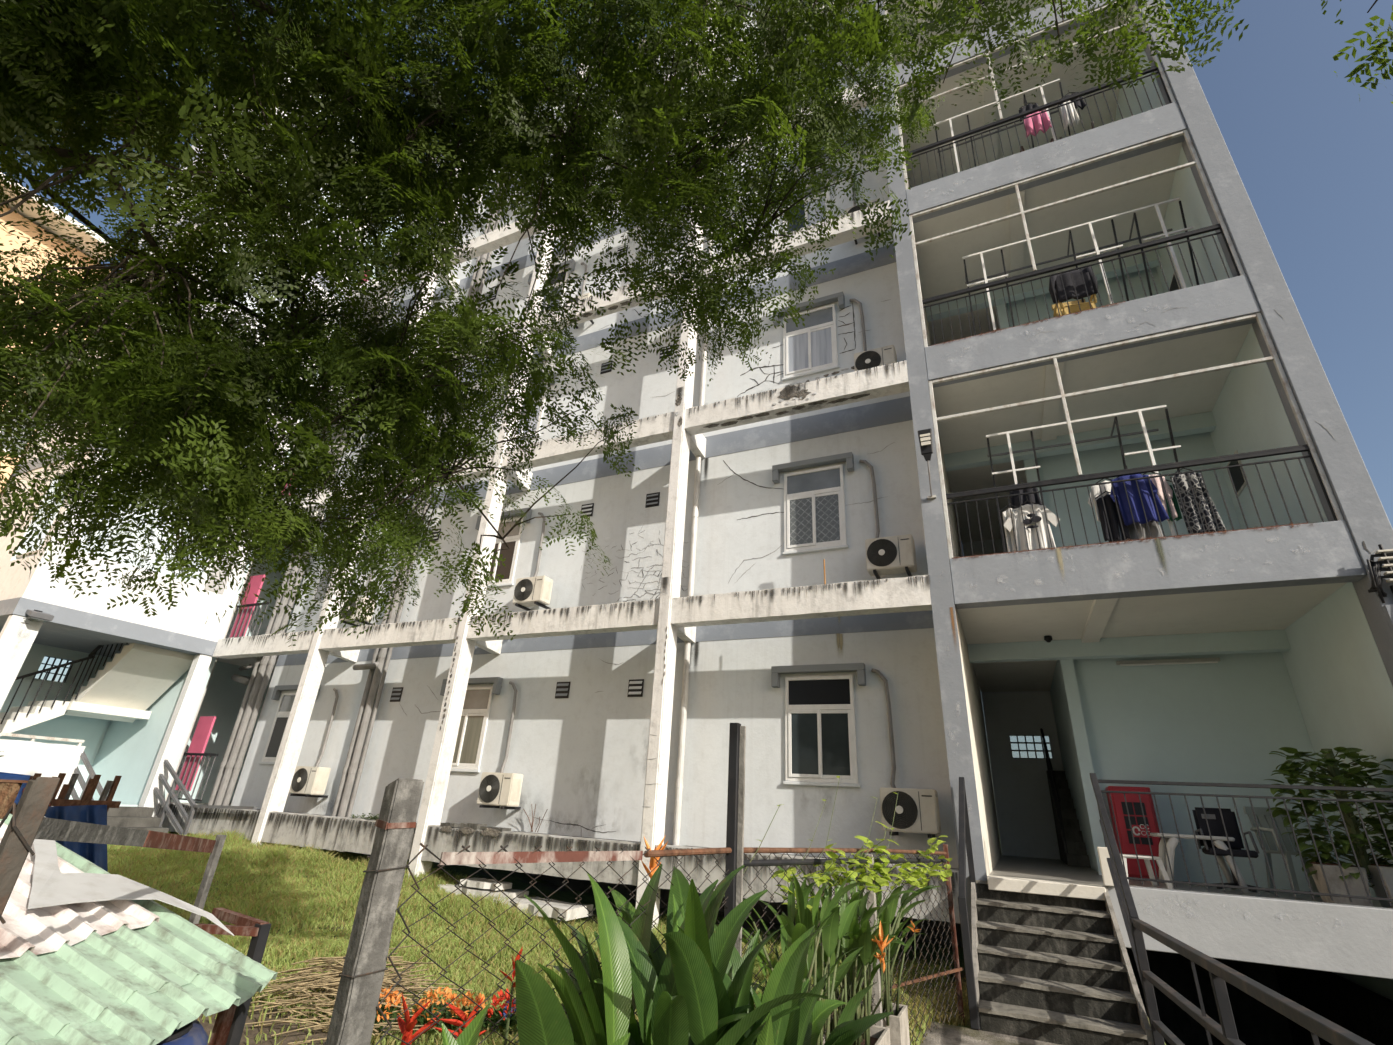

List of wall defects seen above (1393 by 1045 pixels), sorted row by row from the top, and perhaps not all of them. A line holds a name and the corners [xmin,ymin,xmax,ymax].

crack [737,345,784,397]
damp [689,360,904,415]
crack [719,460,784,583]
damp [225,577,668,644]
crack [581,524,689,602]
damp [736,579,888,599]
damp [155,804,376,839]
damp [414,827,639,864]